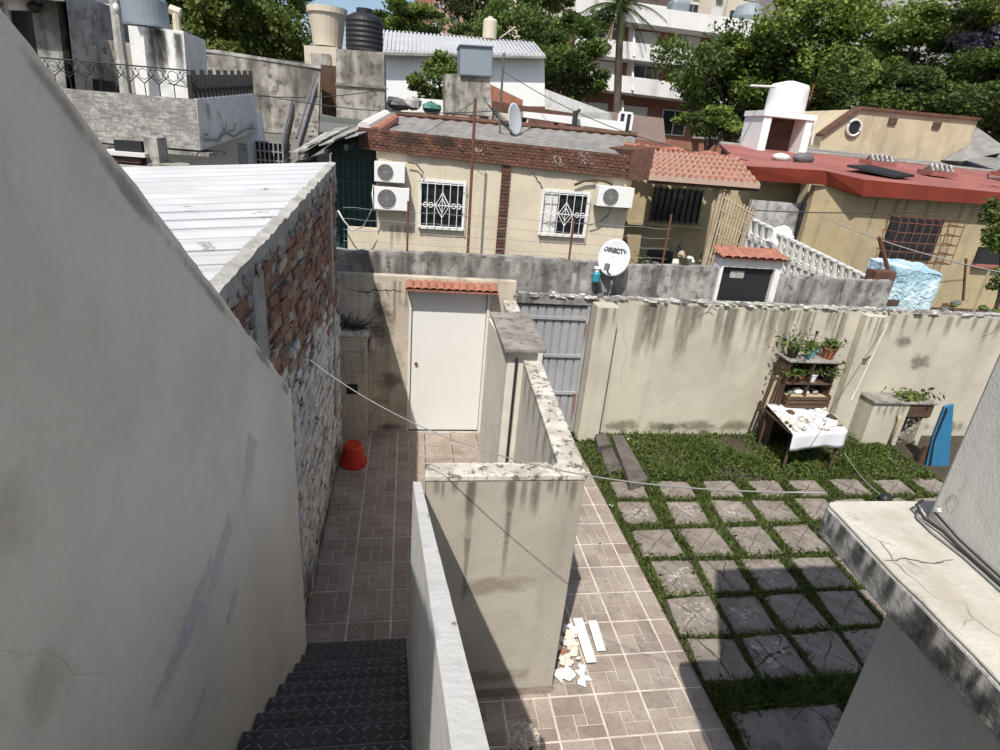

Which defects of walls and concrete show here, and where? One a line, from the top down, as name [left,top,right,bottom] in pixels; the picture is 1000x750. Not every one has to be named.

spalling [209,161,336,316]
crack [618,464,995,677]
water stain [825,512,846,543]
water stain [853,541,876,577]
water stain [884,577,900,599]
water stain [890,604,1000,715]